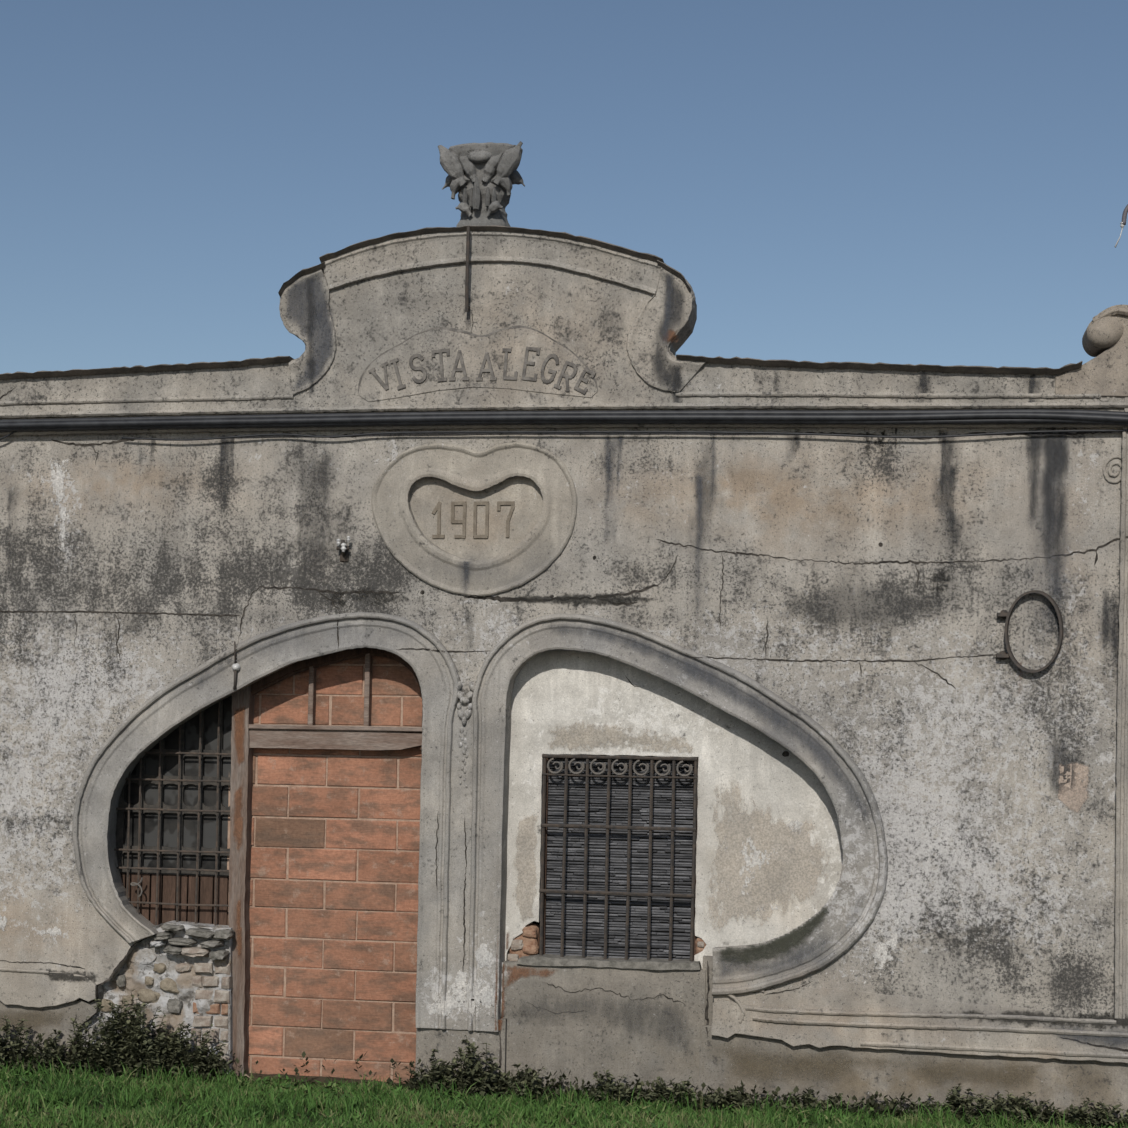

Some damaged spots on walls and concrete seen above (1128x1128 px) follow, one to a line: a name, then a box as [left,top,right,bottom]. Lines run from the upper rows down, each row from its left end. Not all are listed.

water stain [289,278,331,393]
water stain [655,276,682,410]
water stain [220,436,234,464]
water stain [941,433,958,538]
water stain [1028,429,1067,593]
crack [0,586,399,690]
water stain [331,589,408,607]
crack [466,536,1128,630]
crack [694,620,999,689]
water stain [930,570,950,593]
flaking render [75,901,241,1076]
peeling [428,943,494,1018]